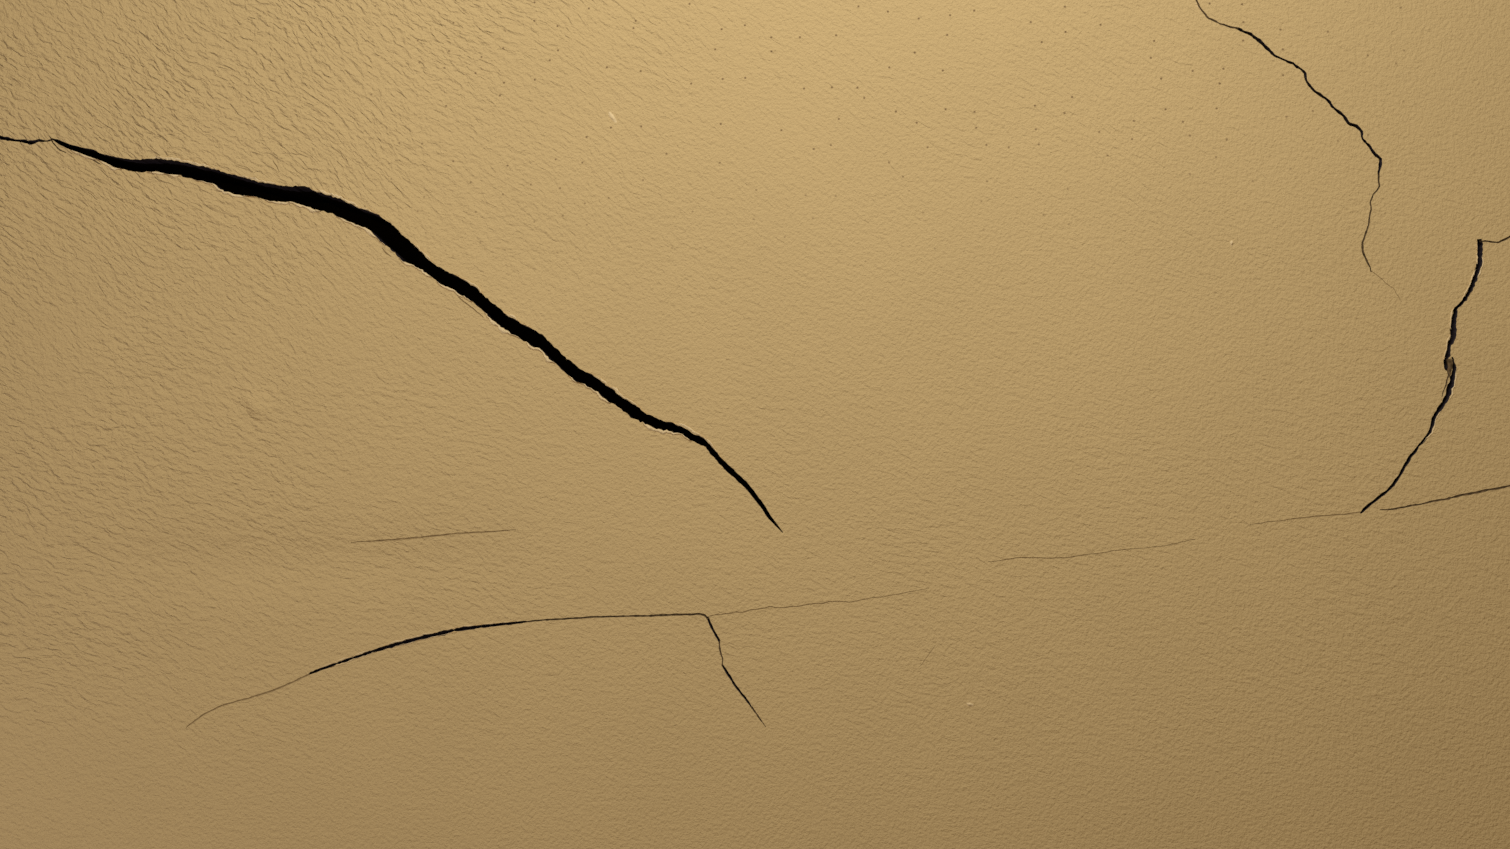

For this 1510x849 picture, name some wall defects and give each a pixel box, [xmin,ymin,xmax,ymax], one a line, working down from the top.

crack [1195,0,1402,302]
crack [0,135,783,533]
crack [1250,236,1510,525]
crack [351,529,516,543]
crack [187,588,928,727]